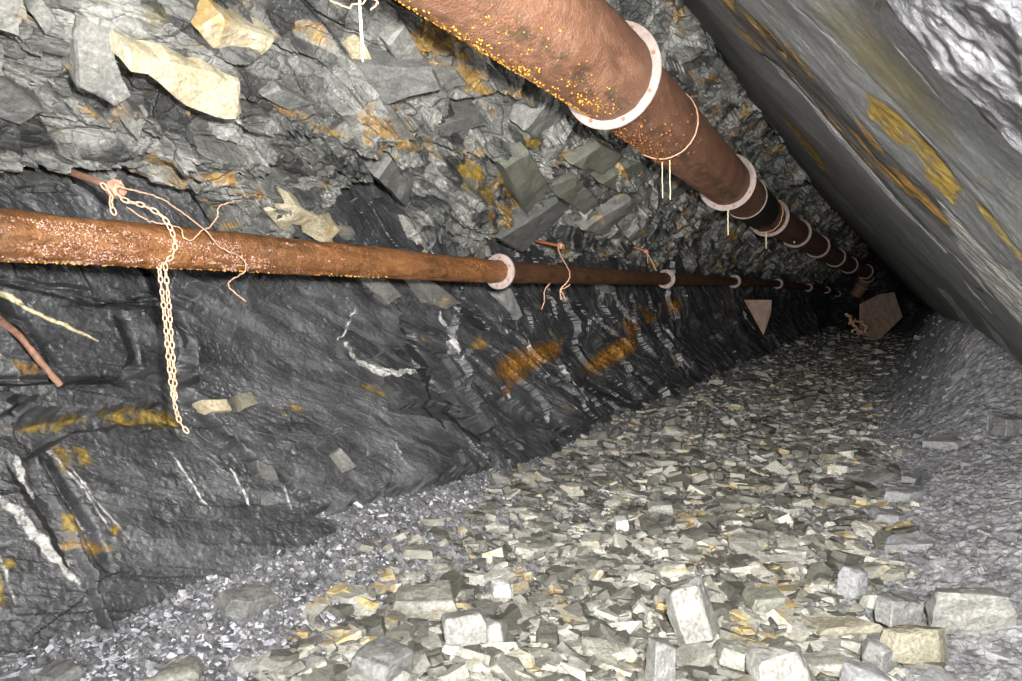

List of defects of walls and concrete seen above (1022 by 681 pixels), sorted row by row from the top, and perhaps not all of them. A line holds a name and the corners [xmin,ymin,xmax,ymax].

corrosion [457,164,513,205]